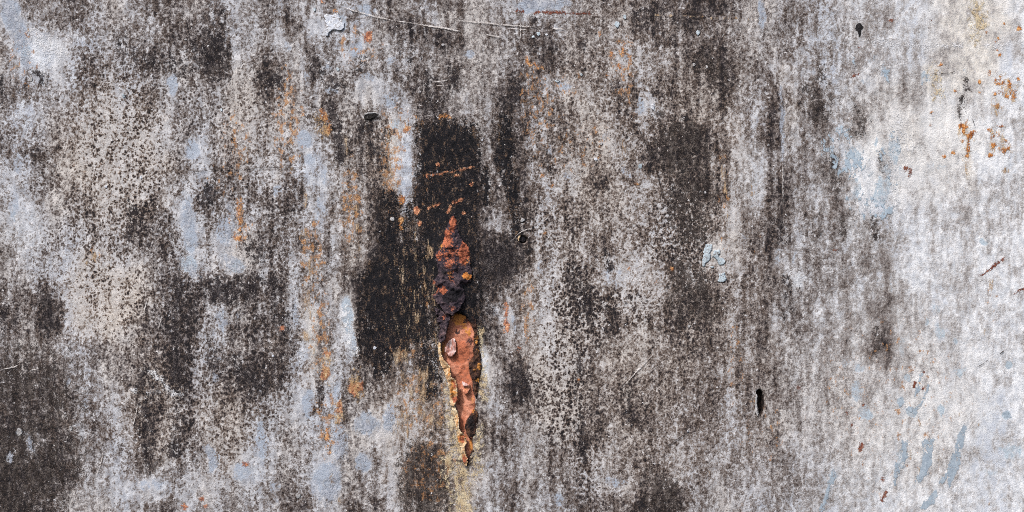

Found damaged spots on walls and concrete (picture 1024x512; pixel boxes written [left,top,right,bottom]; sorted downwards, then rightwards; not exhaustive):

damp [255,67,285,90]
corrosion [942,70,1020,179]
corrosion [967,0,1001,57]
corrosion [398,195,466,236]
damp [357,19,525,400]
damp [564,90,723,338]
damp [0,286,95,512]
damp [131,234,299,476]
corrosion [393,348,484,512]
corrosion [477,326,489,402]